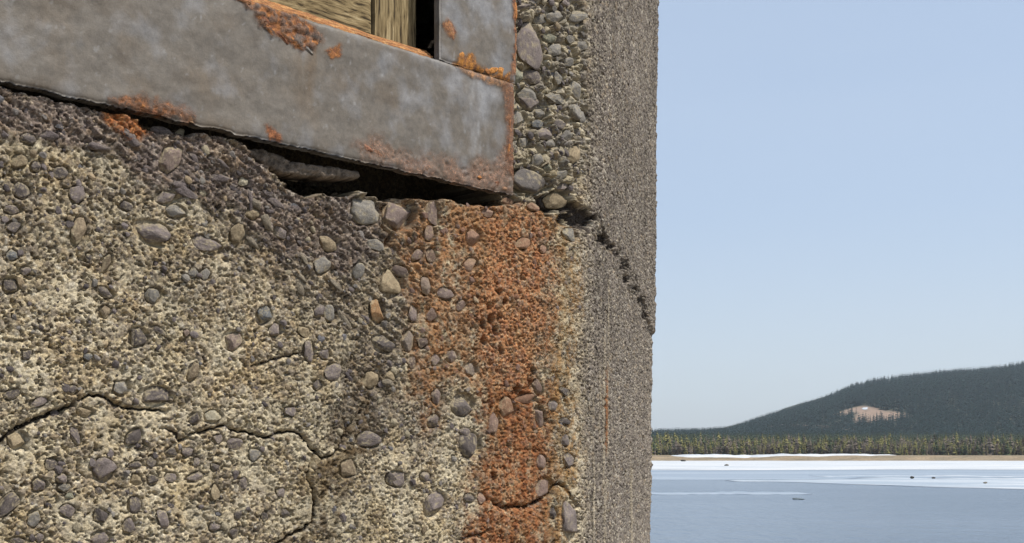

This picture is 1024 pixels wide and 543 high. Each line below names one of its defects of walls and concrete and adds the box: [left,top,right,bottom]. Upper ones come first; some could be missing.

corrosion [239,0,341,58]
corrosion [104,95,196,139]
spalling [0,87,424,435]
corrosion [360,0,579,543]
crack [251,352,304,366]
crack [0,394,353,543]
crack [494,467,571,510]